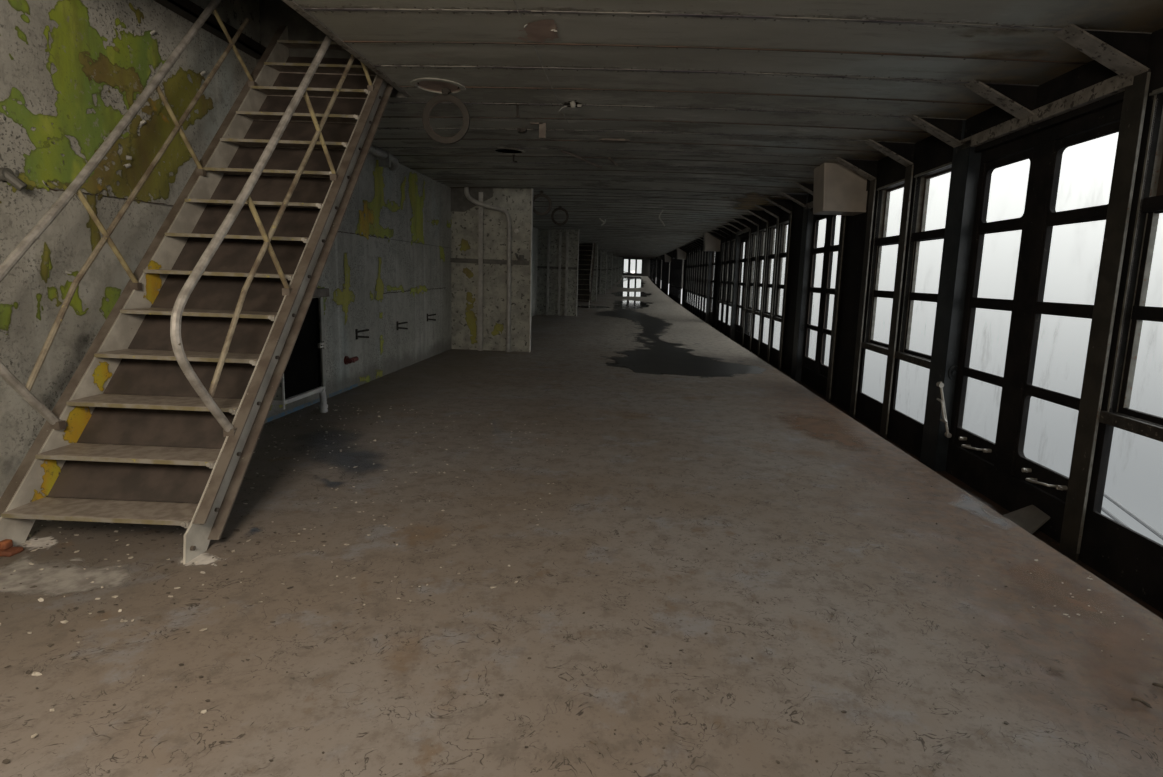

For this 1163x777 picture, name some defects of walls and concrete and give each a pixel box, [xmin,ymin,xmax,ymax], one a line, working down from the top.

peeling [0,0,214,251]
peeling [355,160,452,245]
peeling [36,242,121,321]
peeling [143,260,162,305]
peeling [0,302,18,335]
damp [589,300,773,378]
peeling [92,361,112,391]
peeling [63,406,92,443]
peeling [31,459,61,502]